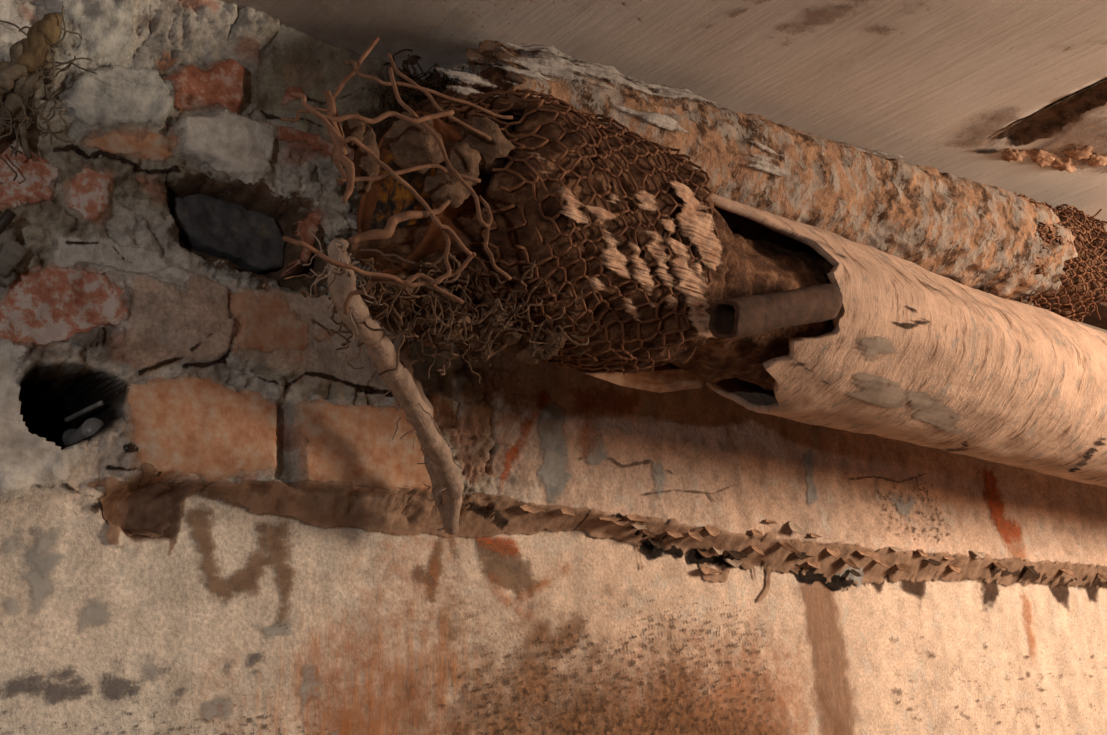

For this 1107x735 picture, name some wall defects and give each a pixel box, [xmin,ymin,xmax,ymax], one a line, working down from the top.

spalling [947,78,1107,173]
spalling [0,167,193,345]
spalling [19,374,104,450]
spalling [87,377,277,547]
crack [138,333,231,376]
crack [258,372,394,405]
spalling [293,399,432,496]
corrosion [983,468,1024,558]
leakage [0,662,289,735]
leakage [248,653,265,676]
leakage [425,565,780,735]
leakage [803,582,855,735]